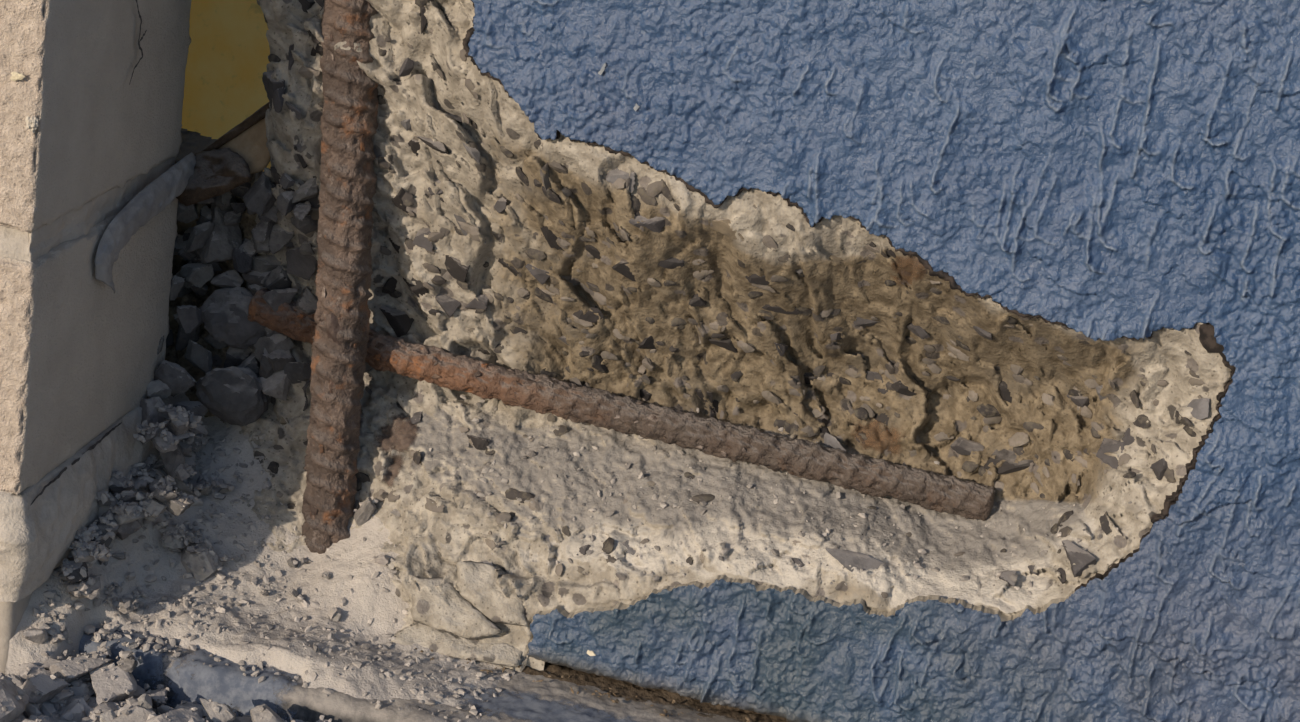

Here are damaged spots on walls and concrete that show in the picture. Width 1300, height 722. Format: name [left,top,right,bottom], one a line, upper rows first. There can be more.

spalling [175,128,217,164]
spalling [172,255,189,276]
spalling [234,0,1236,672]
spalling [165,259,311,553]
corrosion [378,413,418,486]
peeling [452,683,640,722]